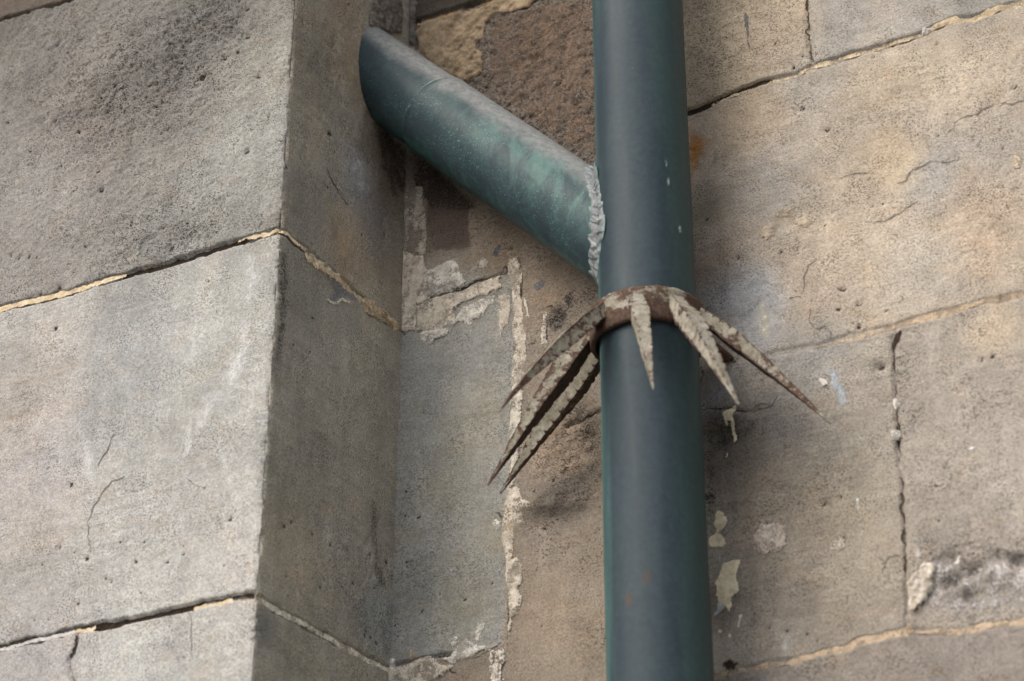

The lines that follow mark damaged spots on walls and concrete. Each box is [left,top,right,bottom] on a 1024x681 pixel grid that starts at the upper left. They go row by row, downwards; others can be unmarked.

crack [948,100,1023,132]
crack [872,160,954,224]
peeling [305,186,530,345]
spalling [540,293,572,347]
crack [892,330,901,452]
crack [87,437,122,551]
peeling [493,371,535,635]
peeling [709,511,728,548]
crack [882,477,907,581]
peeling [715,560,740,611]